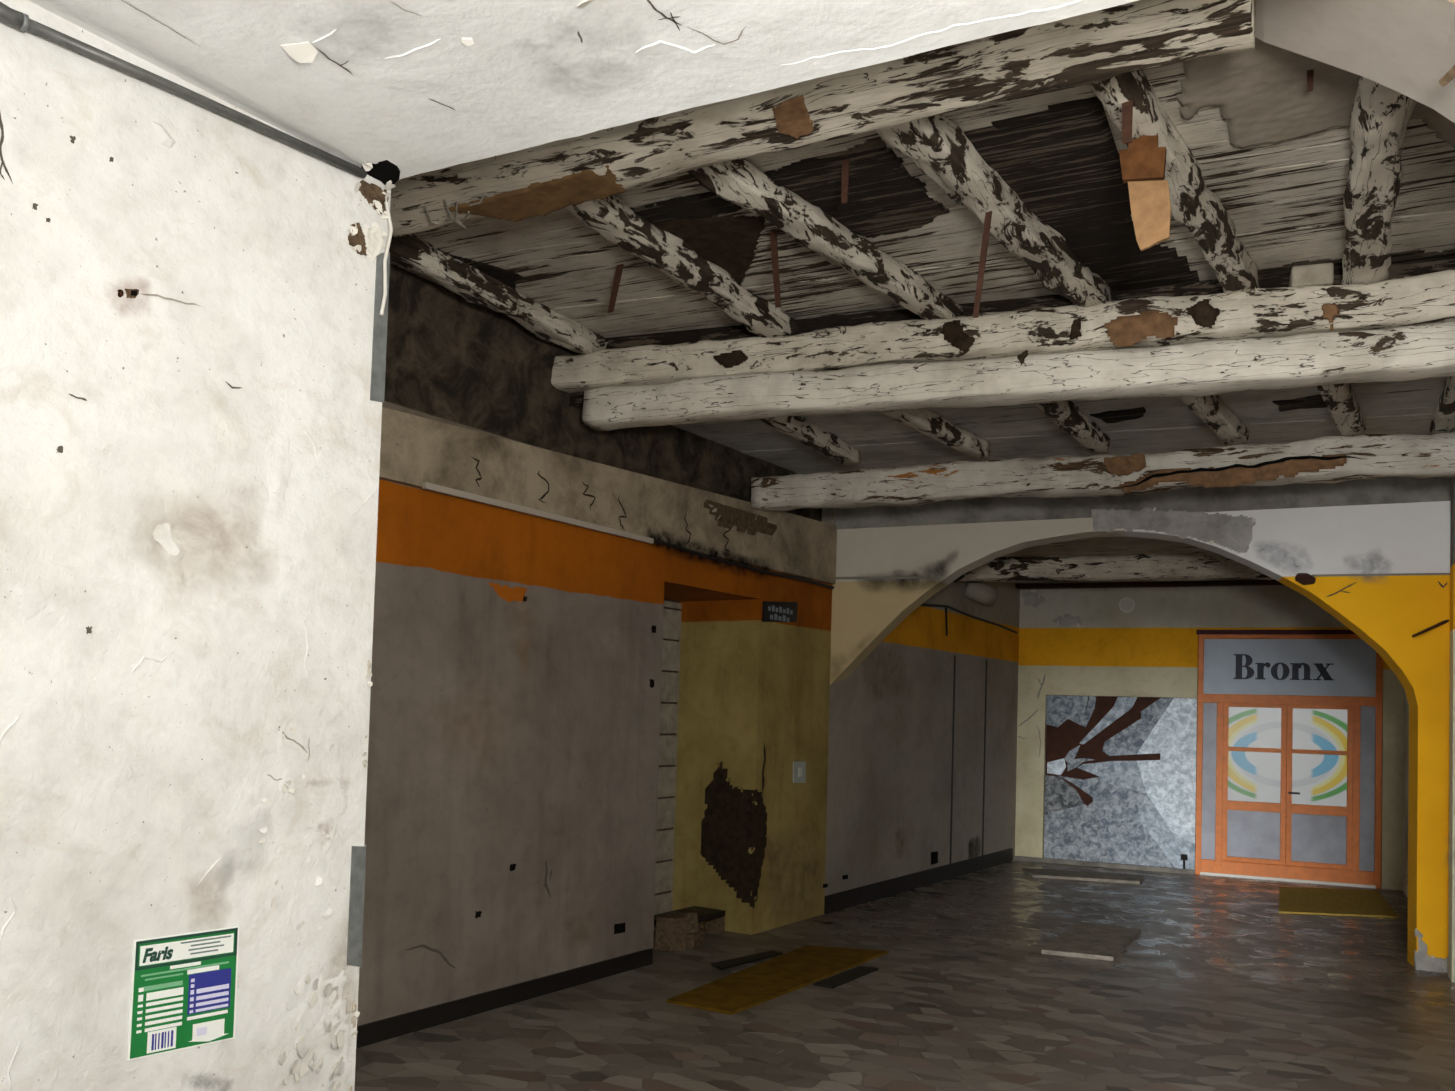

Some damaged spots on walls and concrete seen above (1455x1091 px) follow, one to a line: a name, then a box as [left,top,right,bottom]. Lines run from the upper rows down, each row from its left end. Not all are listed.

peeling [765,137,950,238]
spalling [348,160,400,263]
peeling [446,165,766,290]
peeling [964,97,1220,347]
peeling [1257,258,1343,278]
peeling [1390,249,1455,265]
peeling [1322,303,1339,331]
peeling [943,320,975,352]
peeling [714,350,748,368]
peeling [1089,407,1146,423]
peeling [1272,394,1328,412]
peeling [699,762,769,908]